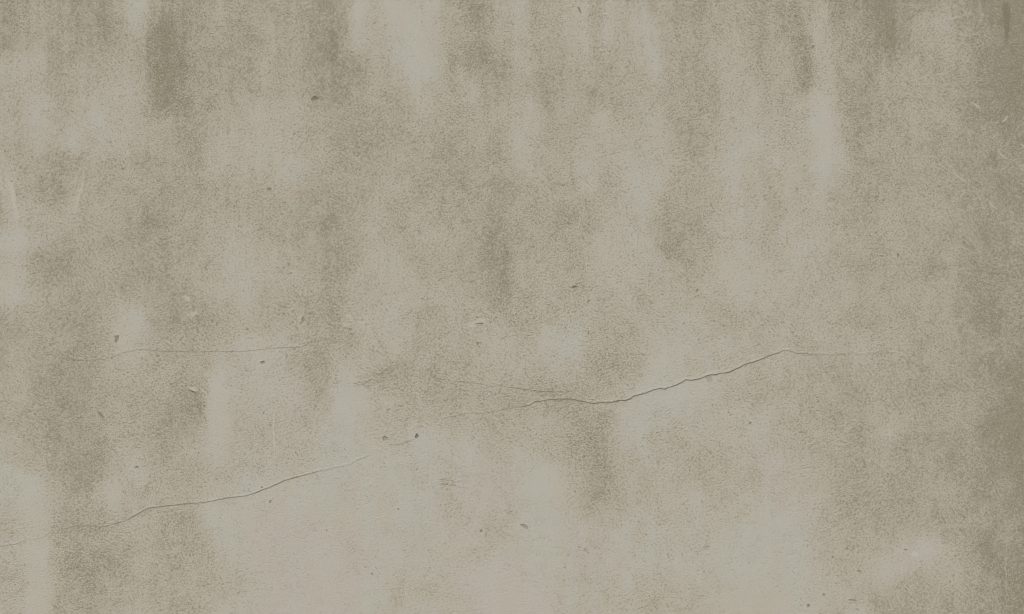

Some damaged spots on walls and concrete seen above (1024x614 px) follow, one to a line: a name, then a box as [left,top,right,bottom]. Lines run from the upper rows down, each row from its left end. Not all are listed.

crack [395,348,894,419]
crack [0,439,414,547]